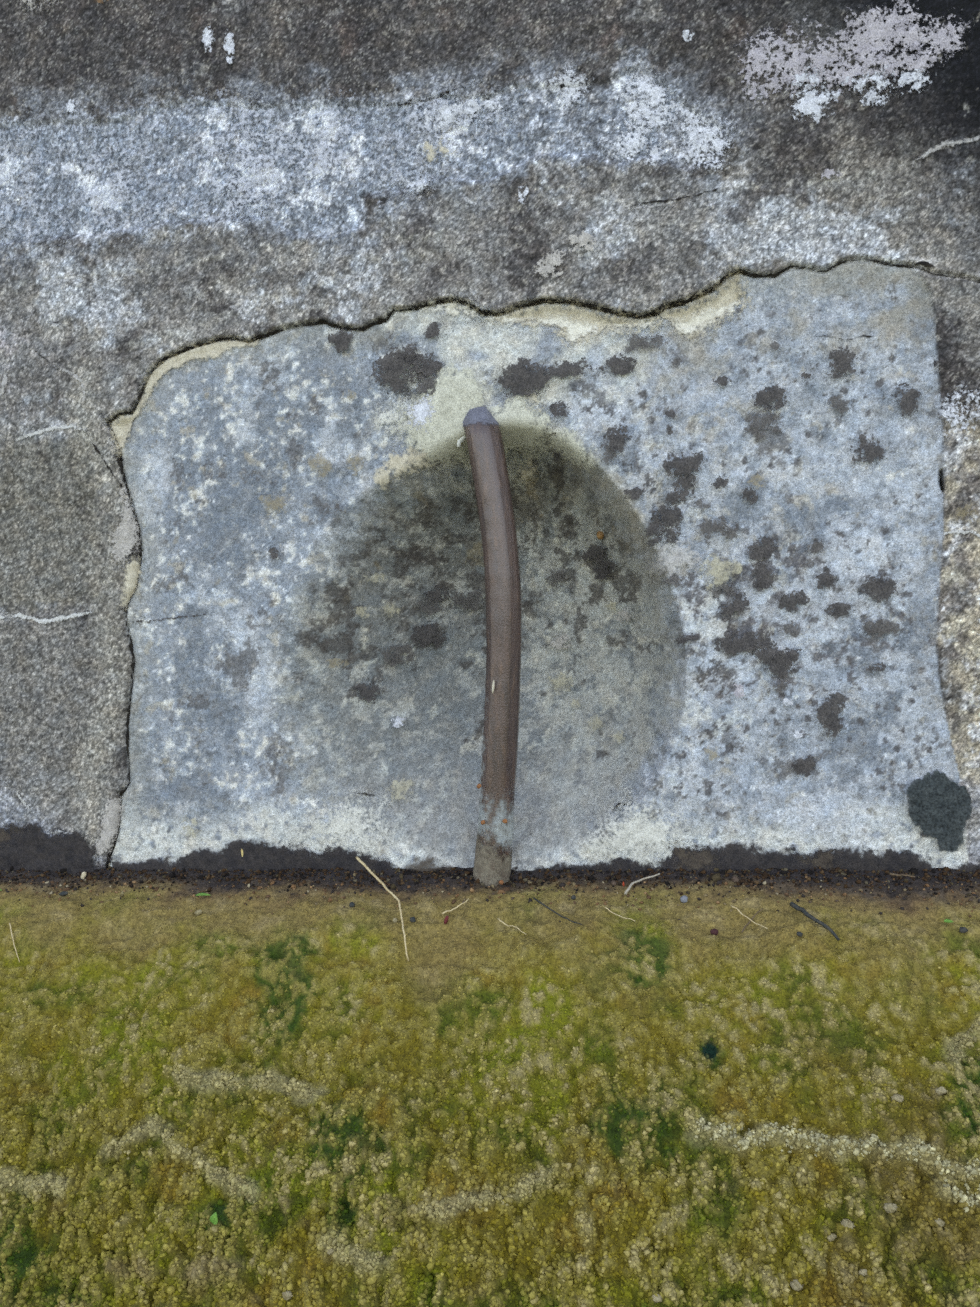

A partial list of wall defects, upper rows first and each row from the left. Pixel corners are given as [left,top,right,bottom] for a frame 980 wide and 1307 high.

crack [0,230,980,566]
crack [0,610,92,624]
crack [105,607,206,868]
crack [5,782,71,834]
leakage [512,788,937,874]
leakage [958,859,980,872]